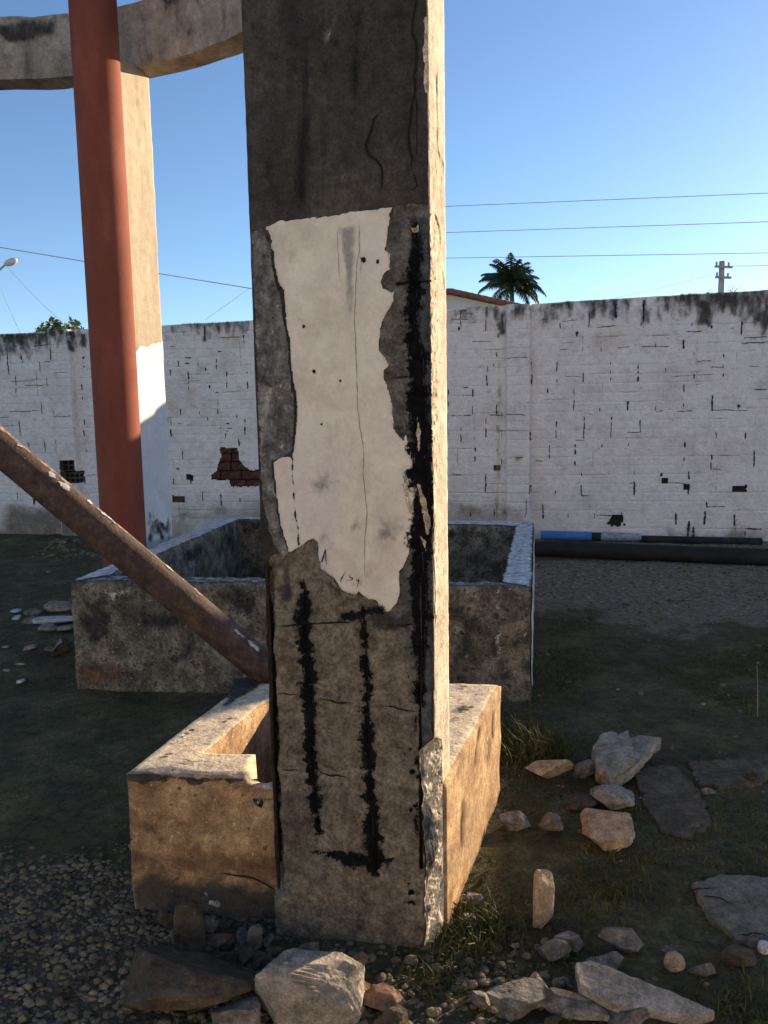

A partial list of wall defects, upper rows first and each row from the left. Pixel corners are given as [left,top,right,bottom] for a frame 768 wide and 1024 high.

crack [365,111,383,190]
water stain [0,329,86,353]
water stain [190,321,248,342]
water stain [459,304,525,334]
water stain [540,299,629,322]
water stain [640,291,768,333]
spalling [49,460,86,491]
spalling [127,204,444,947]